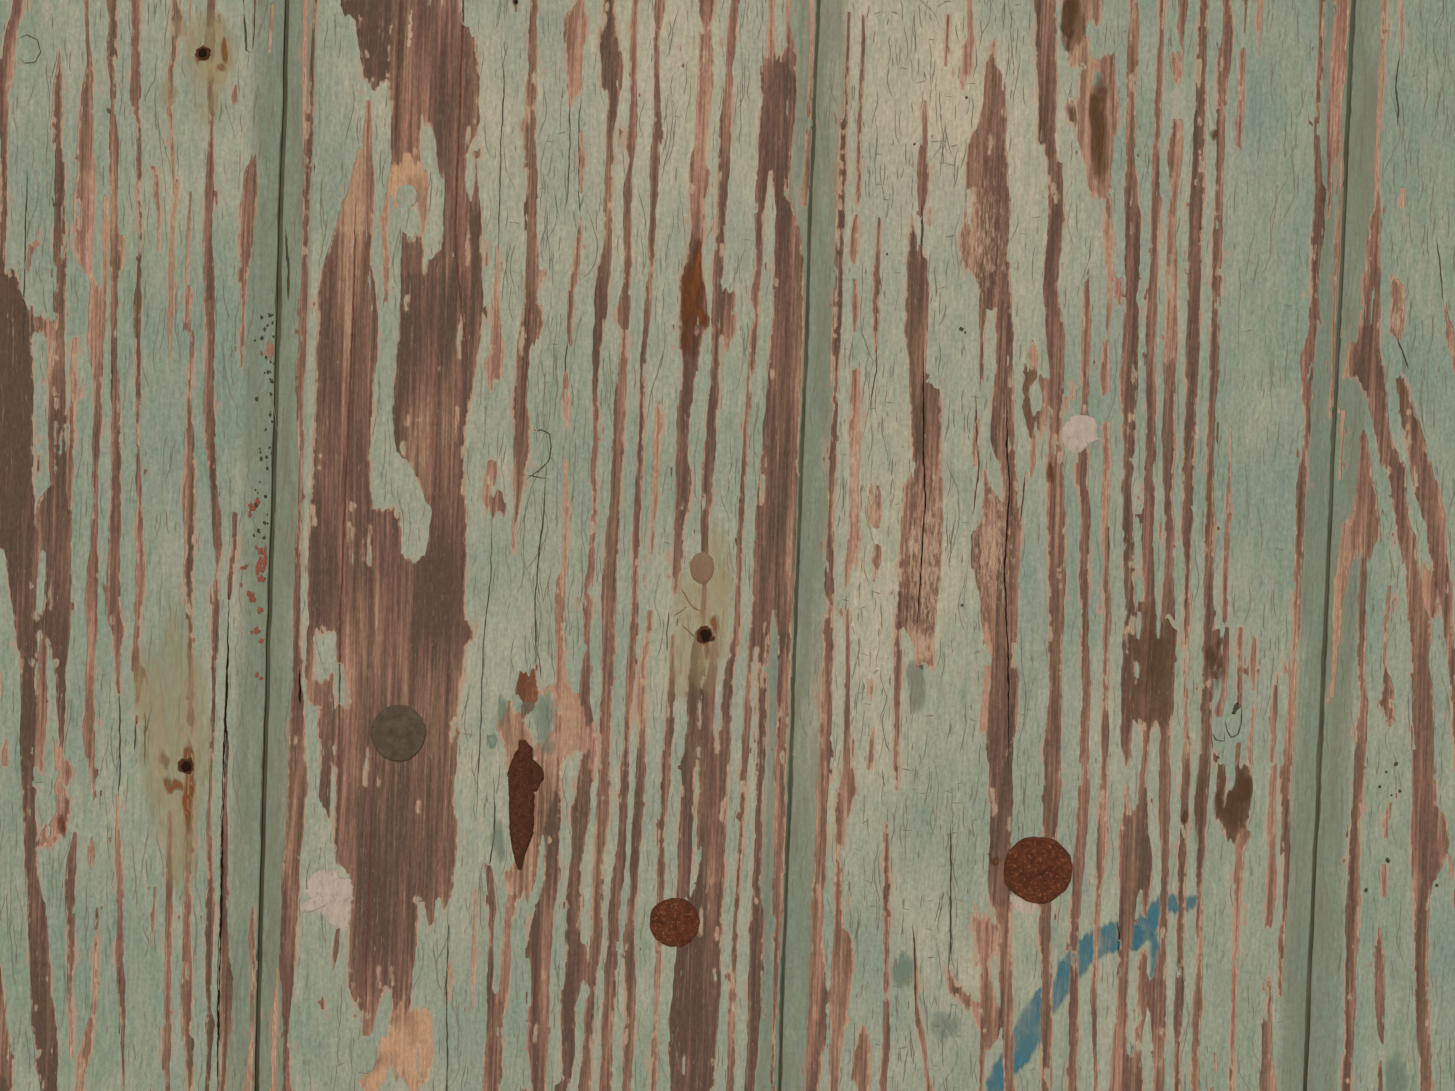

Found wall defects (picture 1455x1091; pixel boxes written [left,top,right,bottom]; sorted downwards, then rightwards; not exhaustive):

corrosion [138,676,197,873]
corrosion [192,21,229,83]
peeling [0,0,548,1091]
peeling [447,0,814,1091]
peeling [944,0,1455,1091]